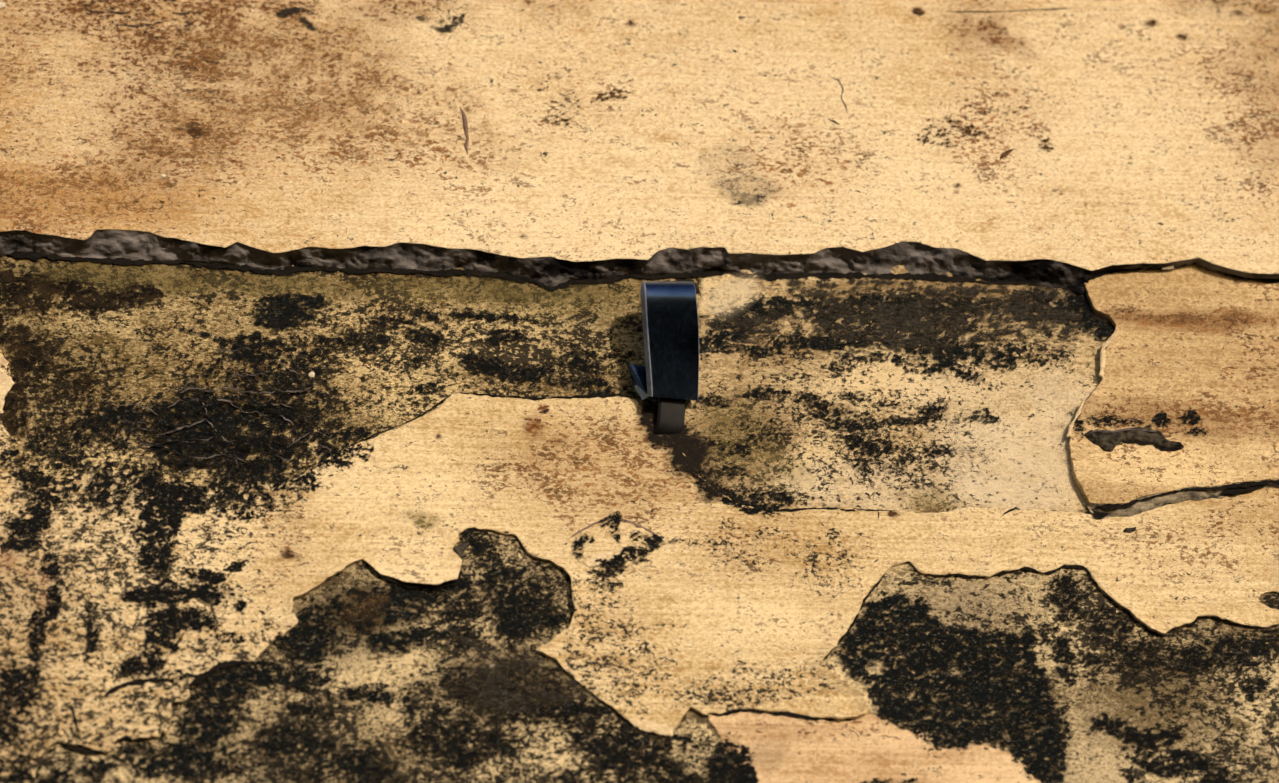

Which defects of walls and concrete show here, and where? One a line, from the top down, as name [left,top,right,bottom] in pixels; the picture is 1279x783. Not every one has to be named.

water stain [0,0,519,234]
crack [0,230,1279,296]
water stain [714,153,774,206]
water stain [1179,0,1279,57]
spalling [0,255,1117,516]
water stain [0,270,759,783]
spalling [35,527,1279,783]